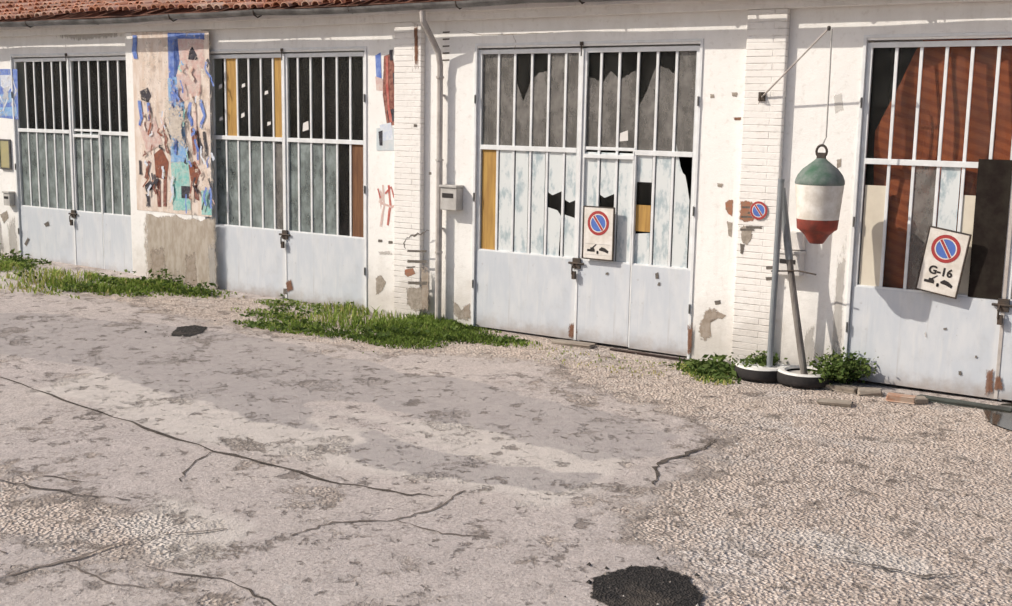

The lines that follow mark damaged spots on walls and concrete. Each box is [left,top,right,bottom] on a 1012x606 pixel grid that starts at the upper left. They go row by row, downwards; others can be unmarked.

spalling [725,200,754,254]
rust [985,369,1003,395]